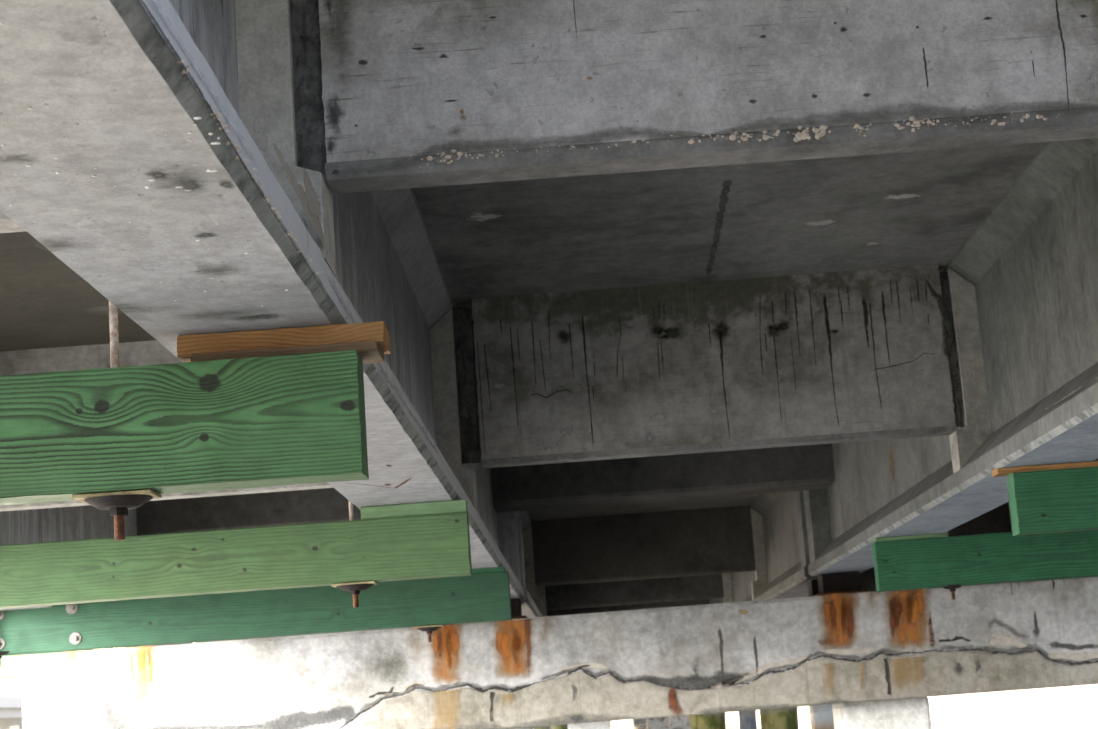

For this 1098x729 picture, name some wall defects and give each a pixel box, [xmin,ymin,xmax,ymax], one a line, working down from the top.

crack [1055,0,1069,106]
damp [709,323,730,437]
damp [759,291,800,422]
damp [809,279,963,425]
rust [66,650,90,706]
damp [103,701,355,729]
rust [434,624,459,726]
crack [338,665,652,729]
rust [496,619,531,675]
rust [818,593,854,647]
crack [724,636,1098,695]
rust [890,589,935,684]